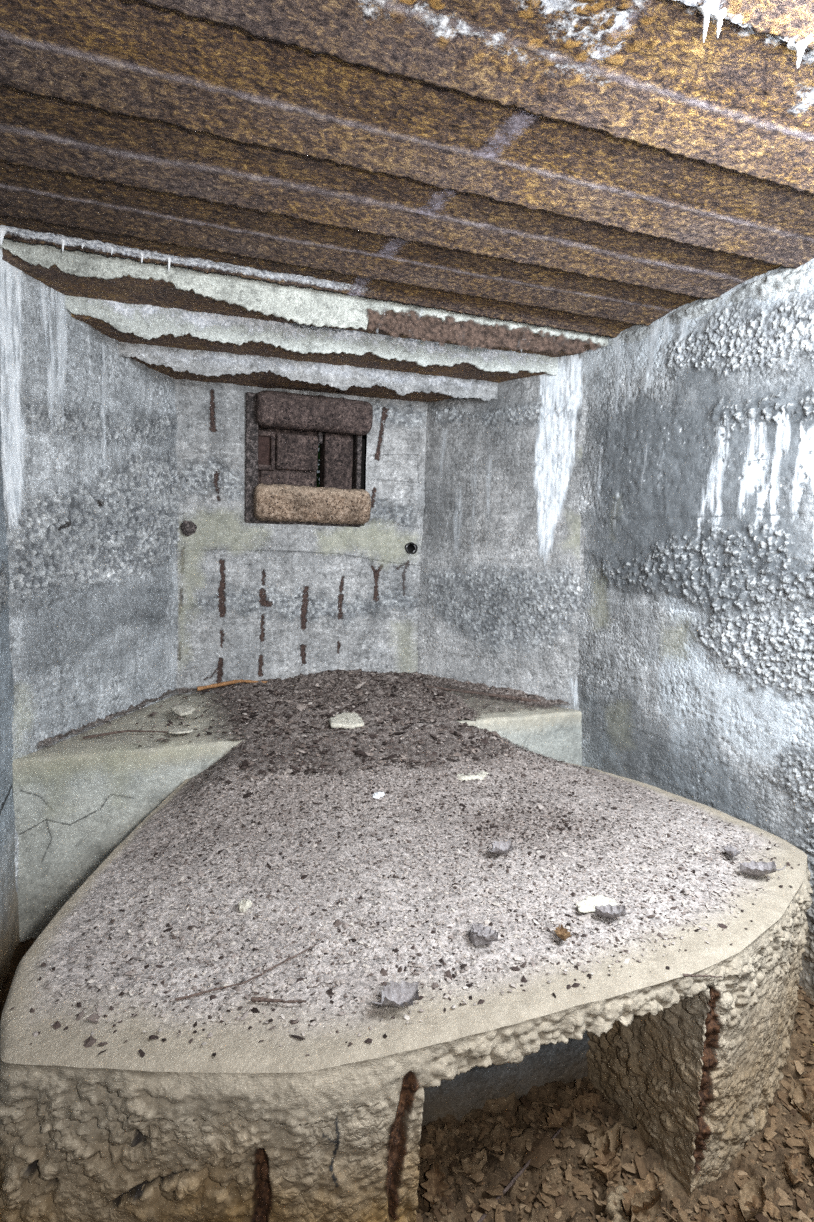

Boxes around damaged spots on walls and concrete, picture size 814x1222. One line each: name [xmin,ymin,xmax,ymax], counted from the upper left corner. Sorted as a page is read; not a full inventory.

leakage [412,4,503,45]
leakage [542,0,641,59]
leakage [678,0,718,15]
leakage [647,317,687,382]
rust [209,390,217,432]
leakage [88,300,583,562]
rust [375,407,389,461]
leakage [590,364,814,601]